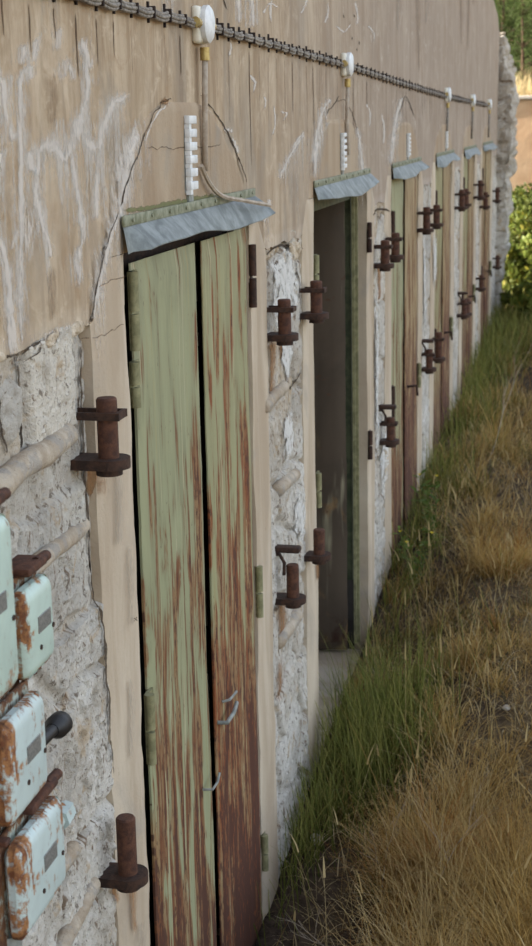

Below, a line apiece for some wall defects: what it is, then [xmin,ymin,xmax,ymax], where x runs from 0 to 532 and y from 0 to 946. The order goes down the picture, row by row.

water stain [0,5,141,353]
water stain [279,88,331,181]
water stain [389,99,407,162]
spalling [0,327,59,362]
peeling [282,346,293,382]
crack [79,95,247,772]